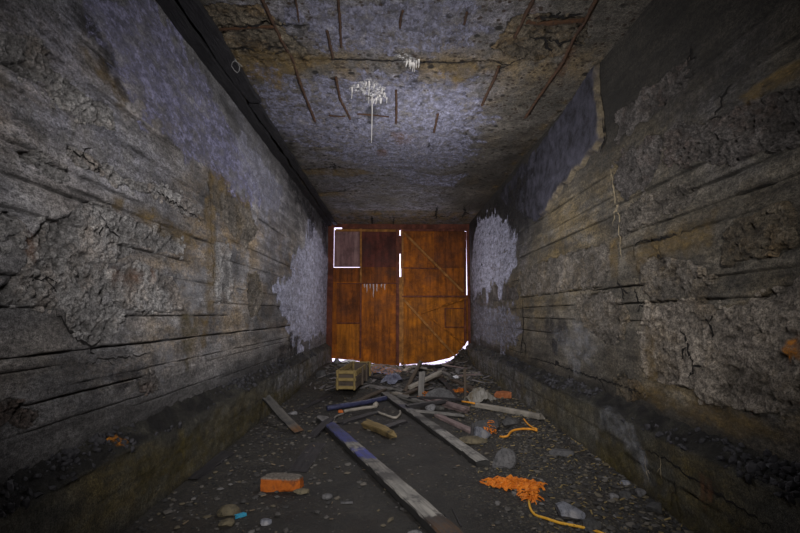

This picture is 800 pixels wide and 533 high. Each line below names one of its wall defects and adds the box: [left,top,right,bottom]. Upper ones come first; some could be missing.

leakage [350,79,387,143]
peeling [203,0,598,187]
crack [221,11,582,73]
leakage [395,50,420,89]
crack [67,148,104,170]
flaking render [472,57,690,355]
spalling [0,199,186,345]
crack [56,310,150,366]
crack [680,330,701,378]